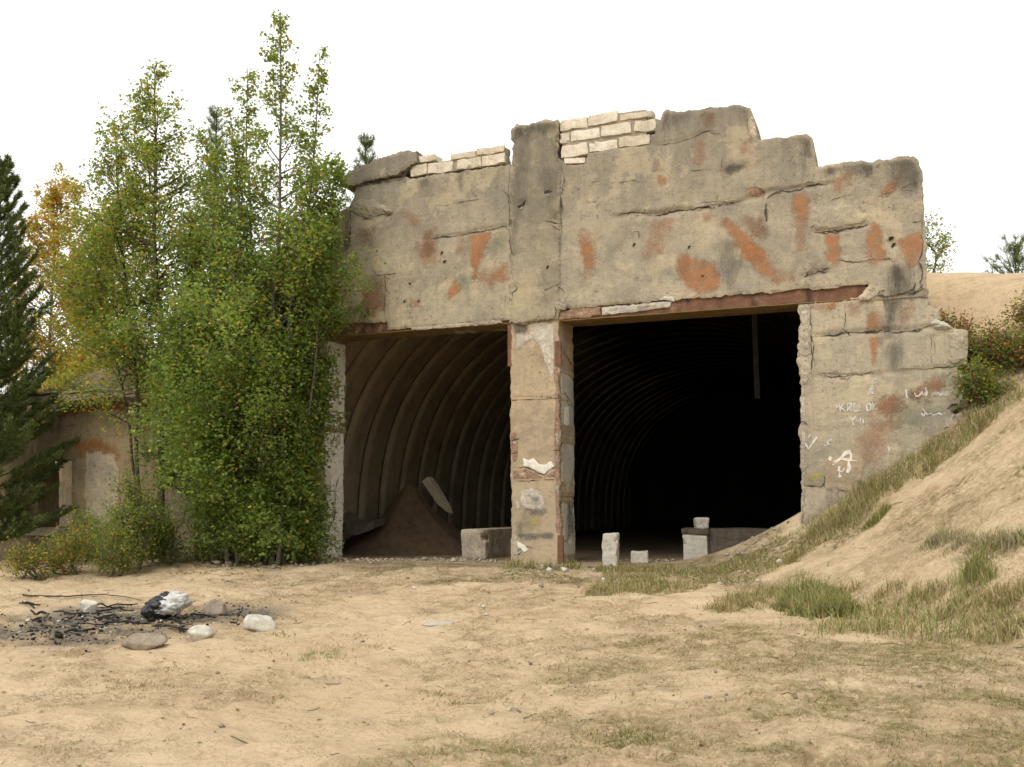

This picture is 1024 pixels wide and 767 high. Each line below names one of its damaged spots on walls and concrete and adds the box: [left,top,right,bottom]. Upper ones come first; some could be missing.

crack [618,181,849,222]
rust [458,232,506,283]
rust [678,256,719,293]
rust [725,220,784,281]
crack [810,224,869,234]
spalling [511,296,675,572]